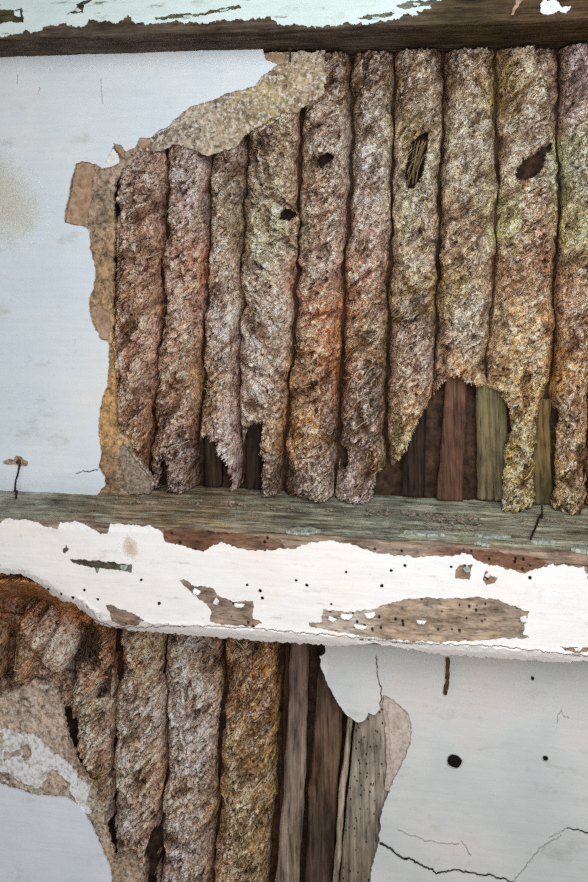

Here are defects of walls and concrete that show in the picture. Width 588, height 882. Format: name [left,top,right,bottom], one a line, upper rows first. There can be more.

peeling [0,8,24,23]
peeling [155,6,241,20]
peeling [360,0,437,20]
flaking render [65,50,327,495]
peeling [366,545,548,585]
peeling [106,605,143,626]
peeling [180,580,261,627]
peeling [309,597,529,791]
flaking render [0,677,145,882]
crack [379,827,588,882]